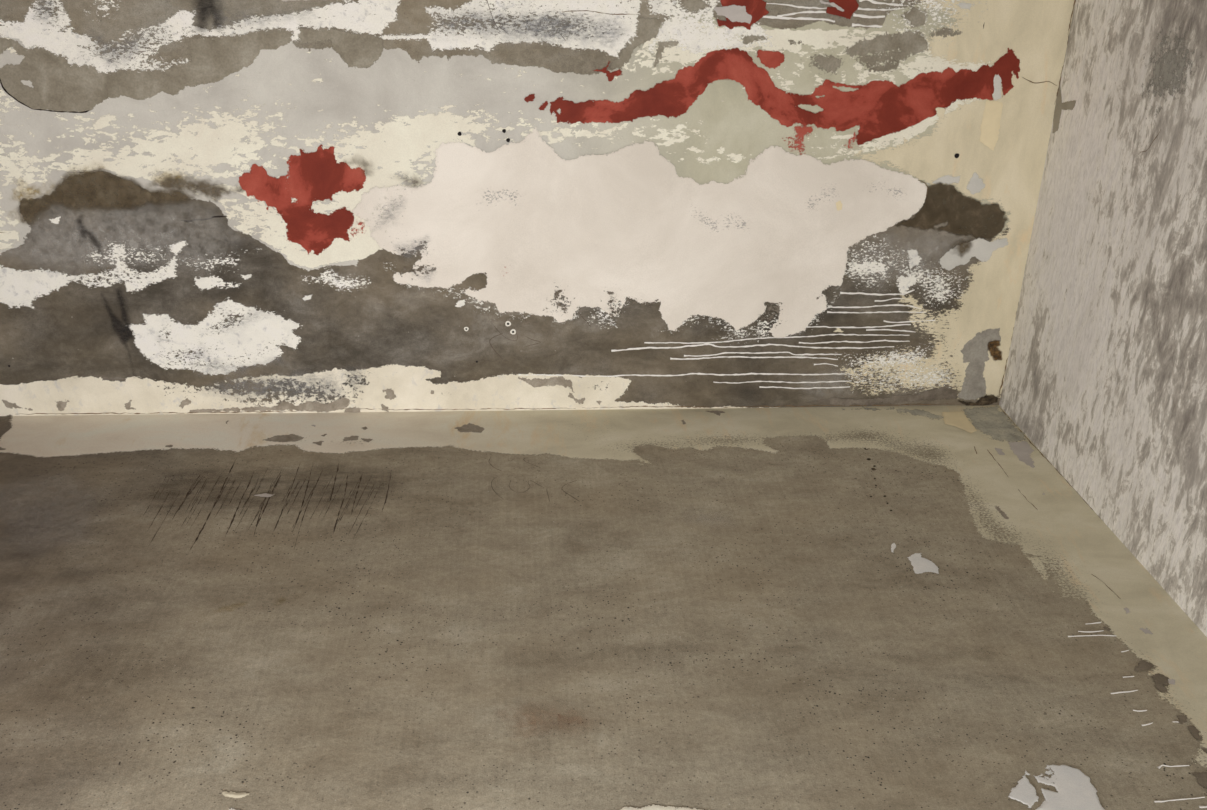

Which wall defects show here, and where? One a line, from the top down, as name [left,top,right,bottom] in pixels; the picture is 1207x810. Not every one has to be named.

damp [19,170,243,223]
peeling [0,0,1076,407]
damp [896,183,1007,256]
peeling [0,364,1207,768]